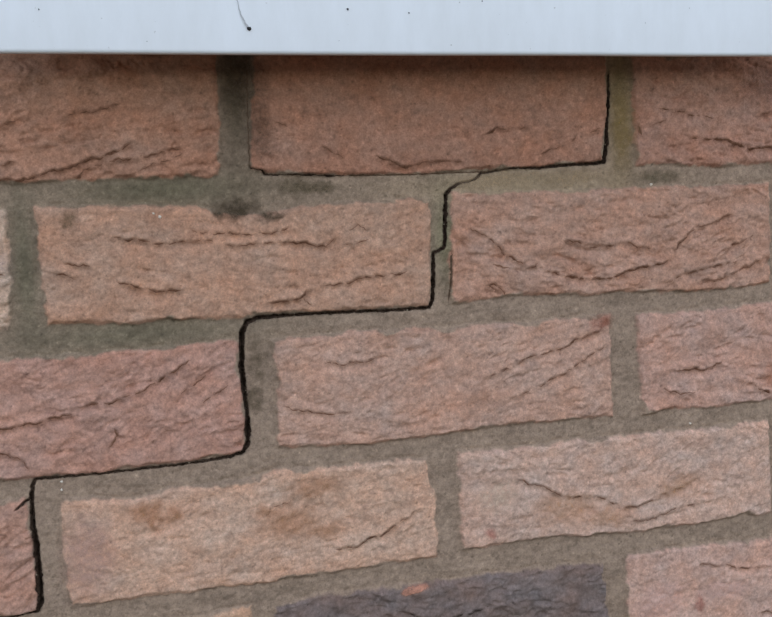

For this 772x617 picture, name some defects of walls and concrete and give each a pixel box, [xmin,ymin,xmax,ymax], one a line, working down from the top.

crack [0,74,610,617]
crack [519,480,693,522]